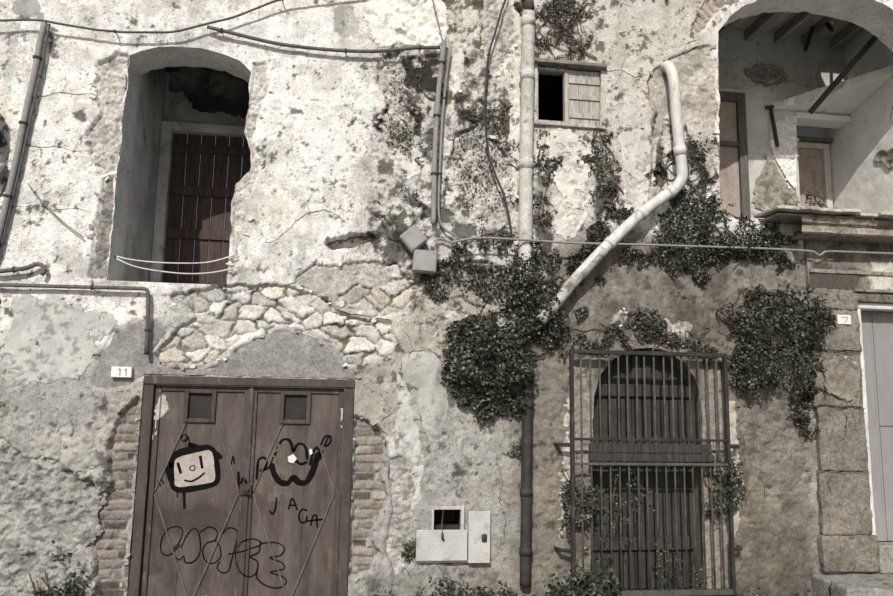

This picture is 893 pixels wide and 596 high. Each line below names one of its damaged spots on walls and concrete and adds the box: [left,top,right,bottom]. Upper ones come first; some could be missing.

spalling [874,148,893,170]
flaking render [0,289,361,391]
peeling [28,423,100,475]
peeling [383,374,425,519]